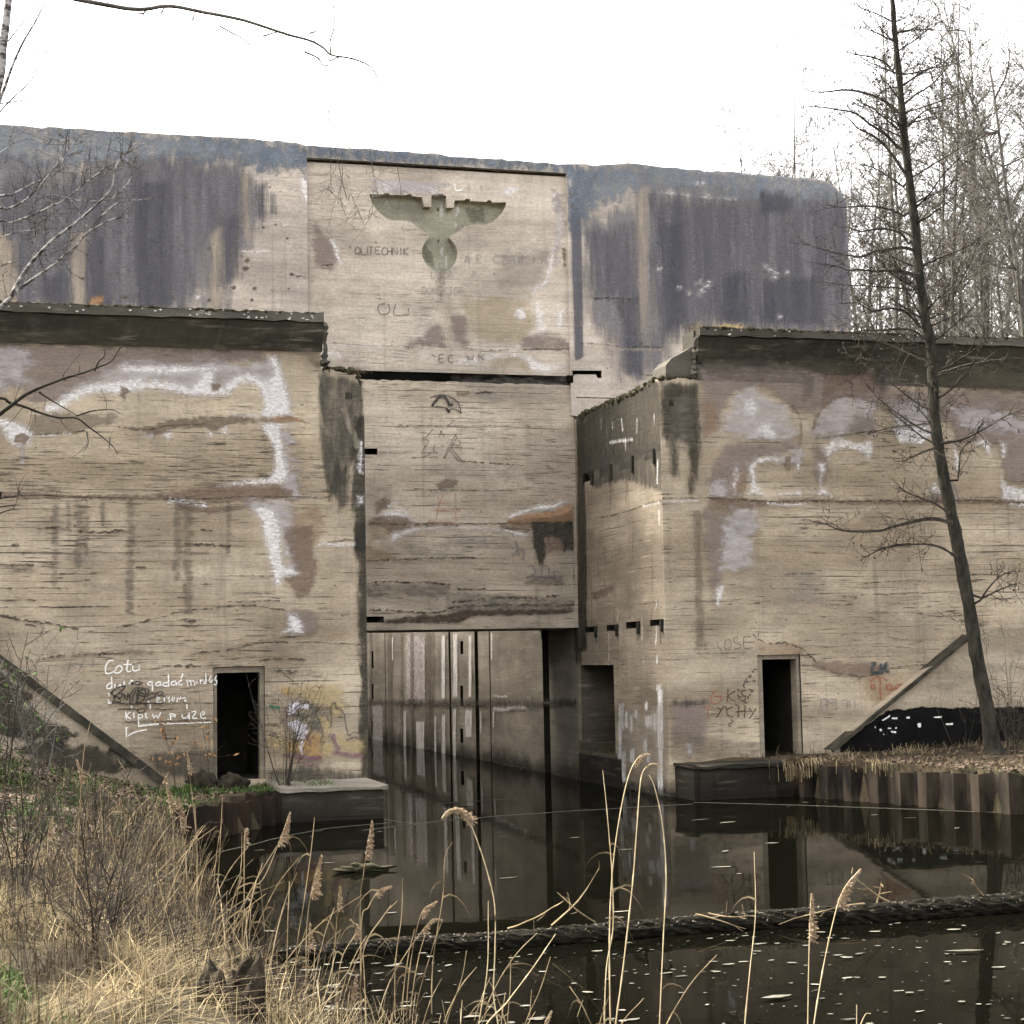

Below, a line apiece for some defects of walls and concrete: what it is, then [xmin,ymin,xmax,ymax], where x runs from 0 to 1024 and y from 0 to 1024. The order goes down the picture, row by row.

leakage [151,750,216,778]
leakage [269,348,576,781]
leakage [0,125,1024,663]
leakage [579,686,760,796]